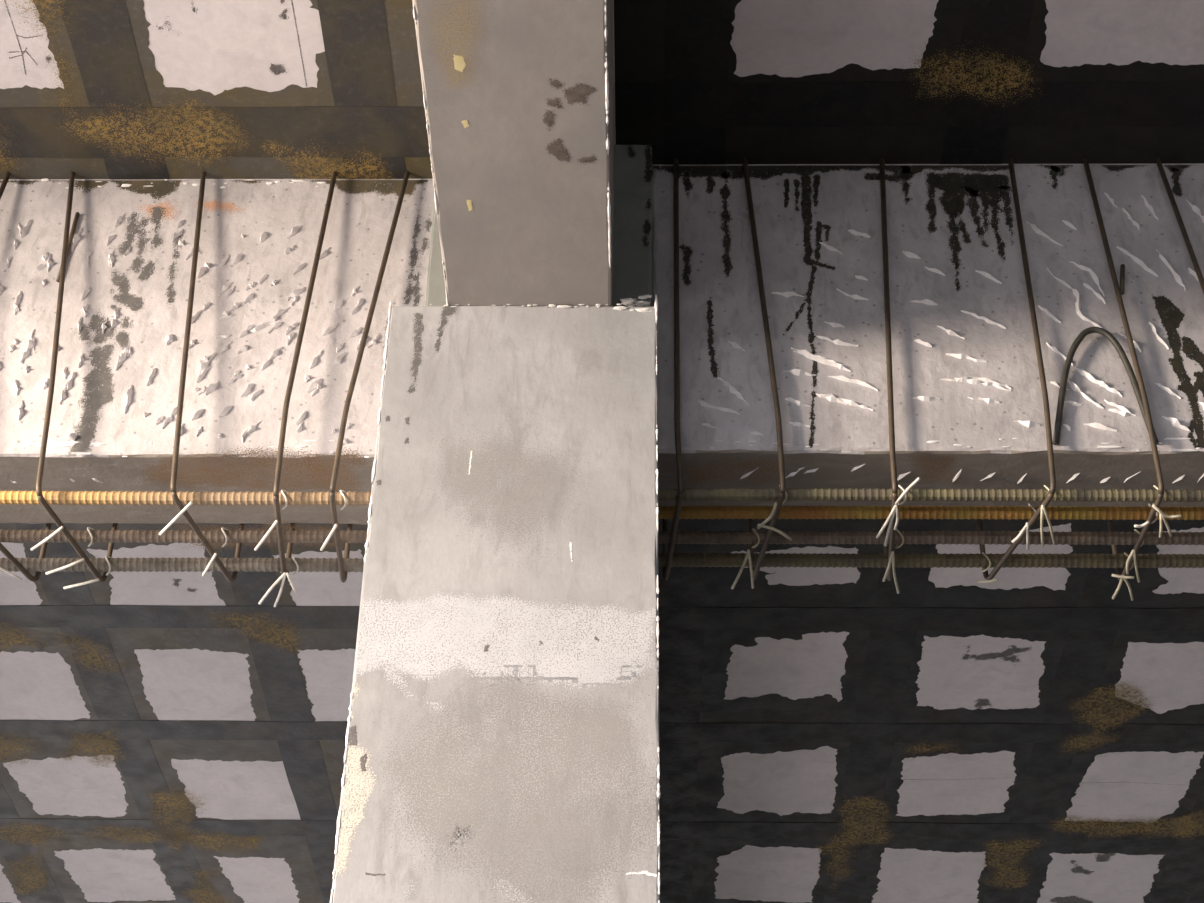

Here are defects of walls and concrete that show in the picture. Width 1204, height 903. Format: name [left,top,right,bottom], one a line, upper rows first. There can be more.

water stain [898,33,1047,110]
water stain [1036,165,1073,190]
water stain [0,0,431,452]
water stain [627,143,1015,448]
spalling [1047,261,1106,328]
spalling [144,247,331,437]
spalling [783,347,878,391]
spalling [1046,342,1136,417]
spalling [0,286,392,572]
rust [142,443,367,492]
rust [171,520,352,551]
spalling [656,420,1204,689]